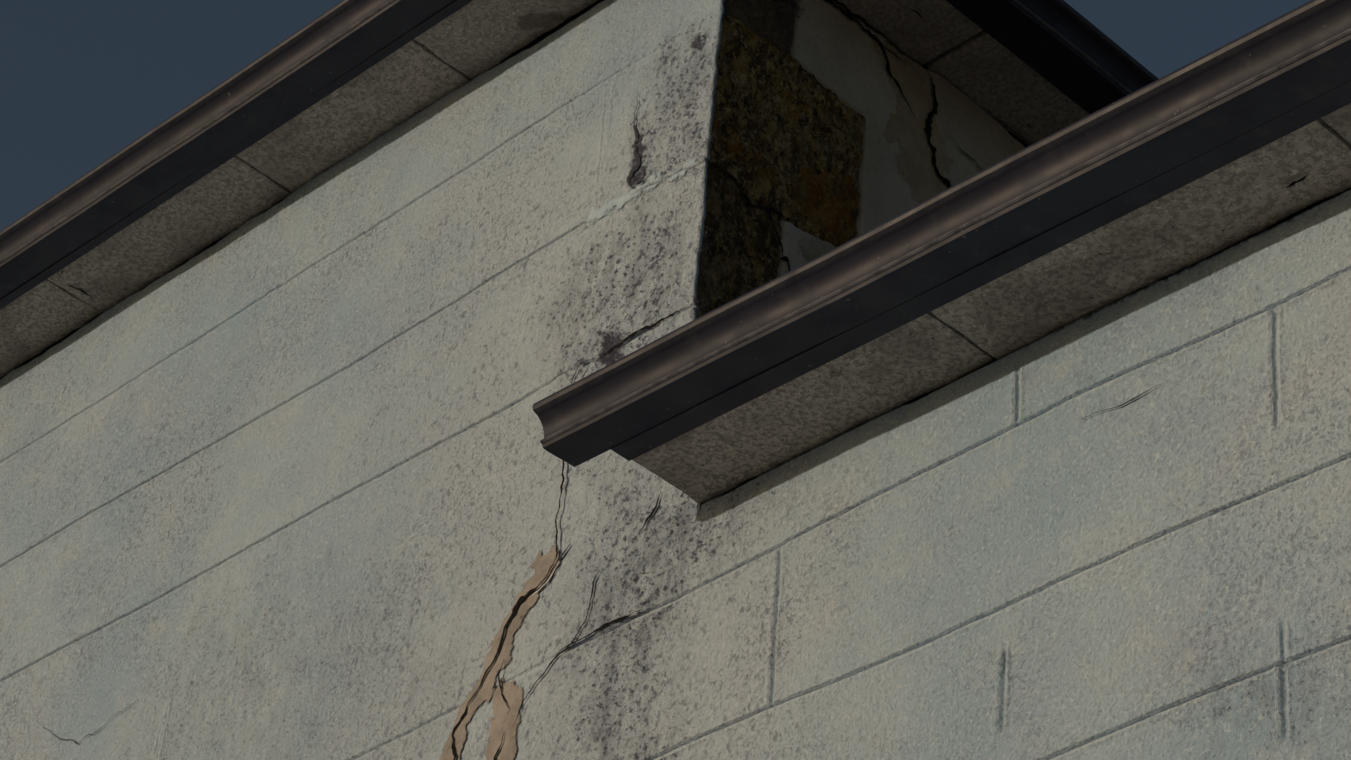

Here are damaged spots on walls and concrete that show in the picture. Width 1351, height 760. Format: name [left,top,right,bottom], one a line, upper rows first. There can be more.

crack [825,0,983,188]
spalling [873,34,954,203]
water stain [539,188,699,393]
crack [571,307,687,384]
crack [702,155,790,271]
crack [639,491,661,532]
spalling [439,545,561,760]
crack [451,461,643,760]